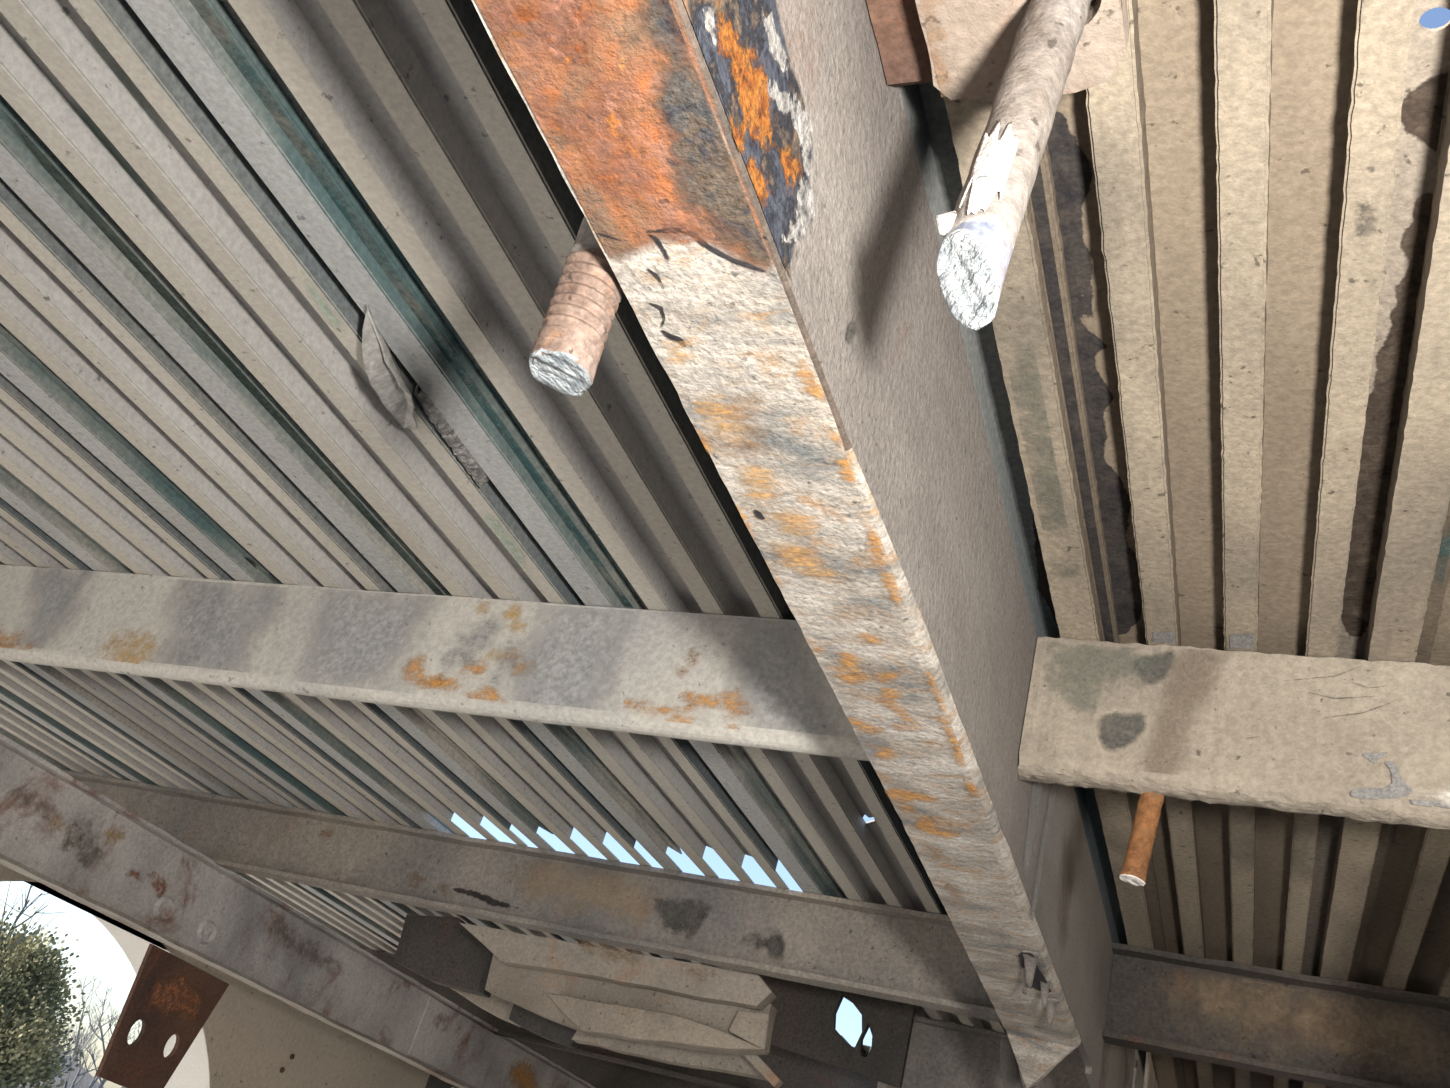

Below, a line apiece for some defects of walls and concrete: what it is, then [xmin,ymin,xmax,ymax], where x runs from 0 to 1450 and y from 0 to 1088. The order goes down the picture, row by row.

corrosion [475,0,801,267]
crack [647,265,686,347]
corrosion [838,460,856,481]
corrosion [869,532,901,604]
corrosion [404,652,532,701]
corrosion [626,692,750,724]
corrosion [813,648,918,732]
corrosion [927,673,965,764]
damp [1101,652,1214,774]
corrosion [886,790,958,859]
damp [657,899,709,938]
damp [755,934,784,957]